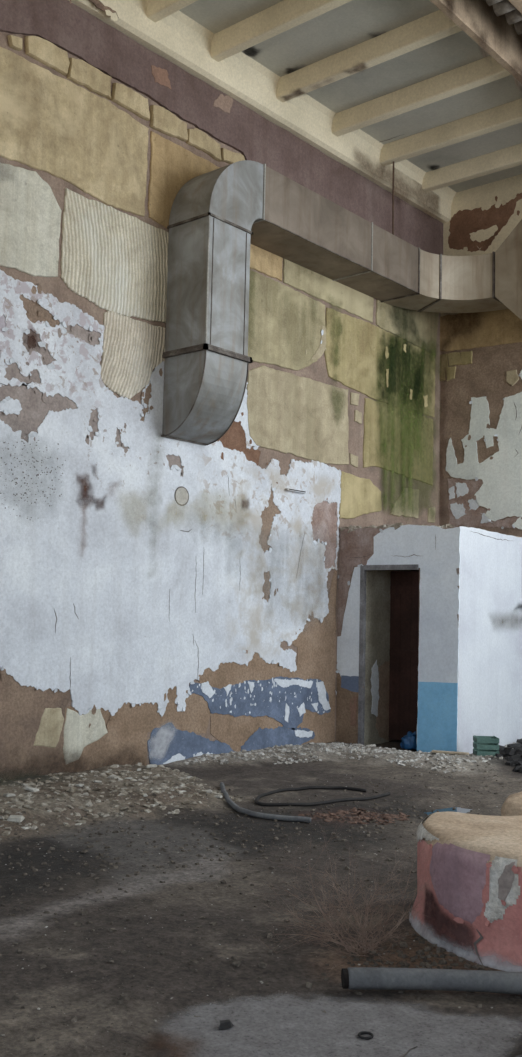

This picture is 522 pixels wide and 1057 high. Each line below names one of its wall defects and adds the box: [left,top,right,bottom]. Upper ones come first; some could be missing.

peeling [89,0,119,21]
peeling [446,193,522,254]
peeling [0,283,103,445]
peeling [140,368,163,421]
damp [380,308,421,399]
peeling [115,423,129,453]
spalling [218,412,268,466]
spalling [409,342,522,529]
peeling [259,482,281,553]
spalling [0,498,390,782]
peeling [416,813,520,927]